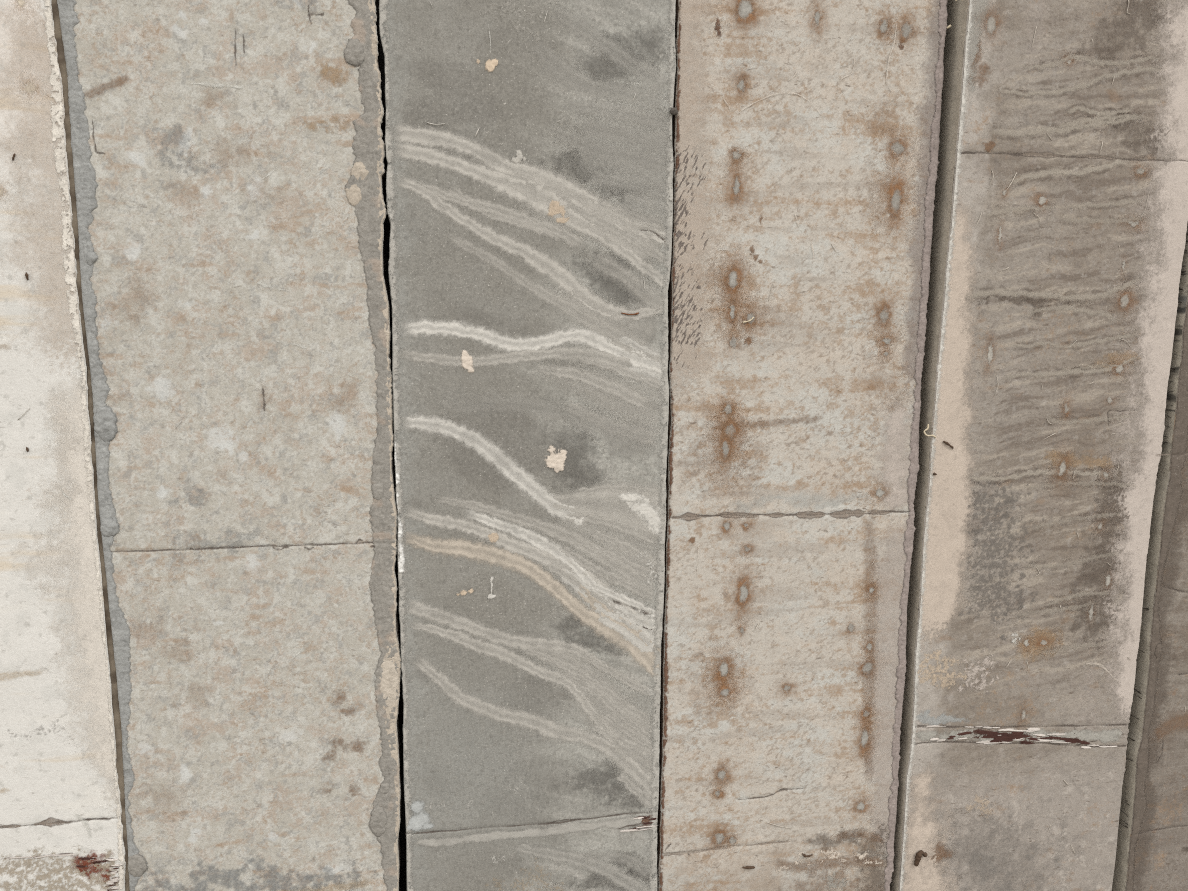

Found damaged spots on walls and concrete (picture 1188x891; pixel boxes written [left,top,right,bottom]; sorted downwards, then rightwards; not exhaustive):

rust [735,0,758,24]
rust [879,17,916,49]
rust [887,178,904,227]
rust [724,265,756,345]
rust [876,303,892,355]
damp [919,0,1188,723]
rust [720,402,741,463]
rust [721,522,753,553]
rust [735,576,751,612]
rust [715,659,734,697]
peeling [0,528,125,891]
spalling [926,725,1117,748]